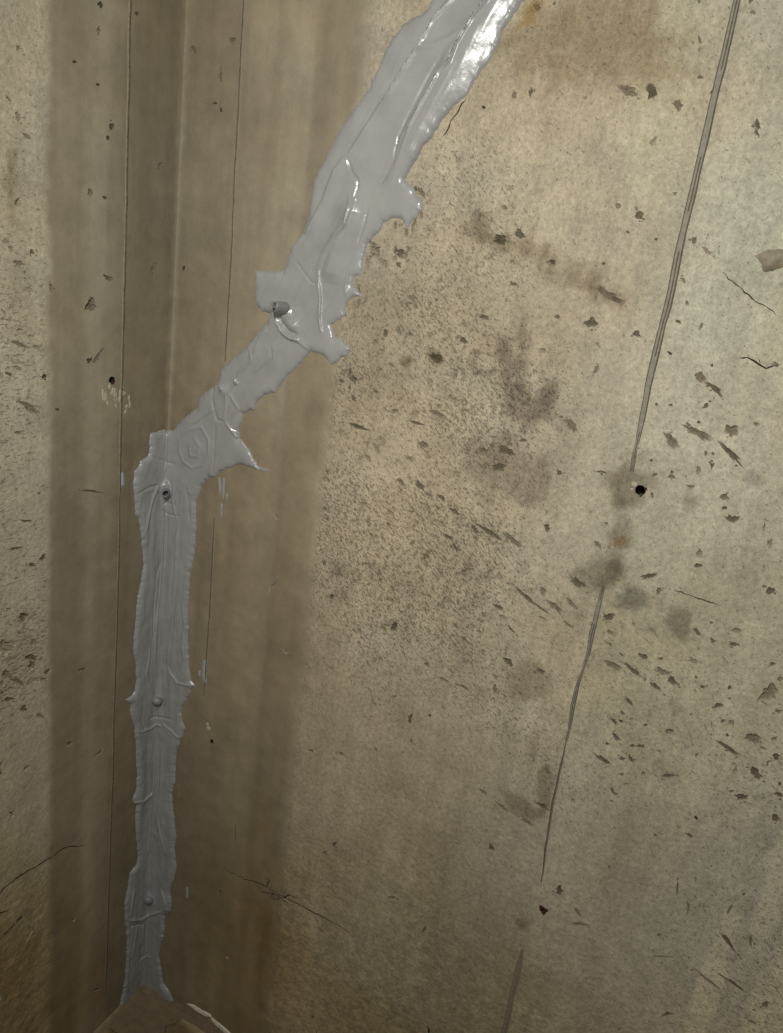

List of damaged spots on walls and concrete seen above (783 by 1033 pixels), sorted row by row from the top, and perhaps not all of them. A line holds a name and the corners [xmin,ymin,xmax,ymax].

crack [0,845,83,939]
crack [230,872,354,938]
water stain [187,1003,230,1033]